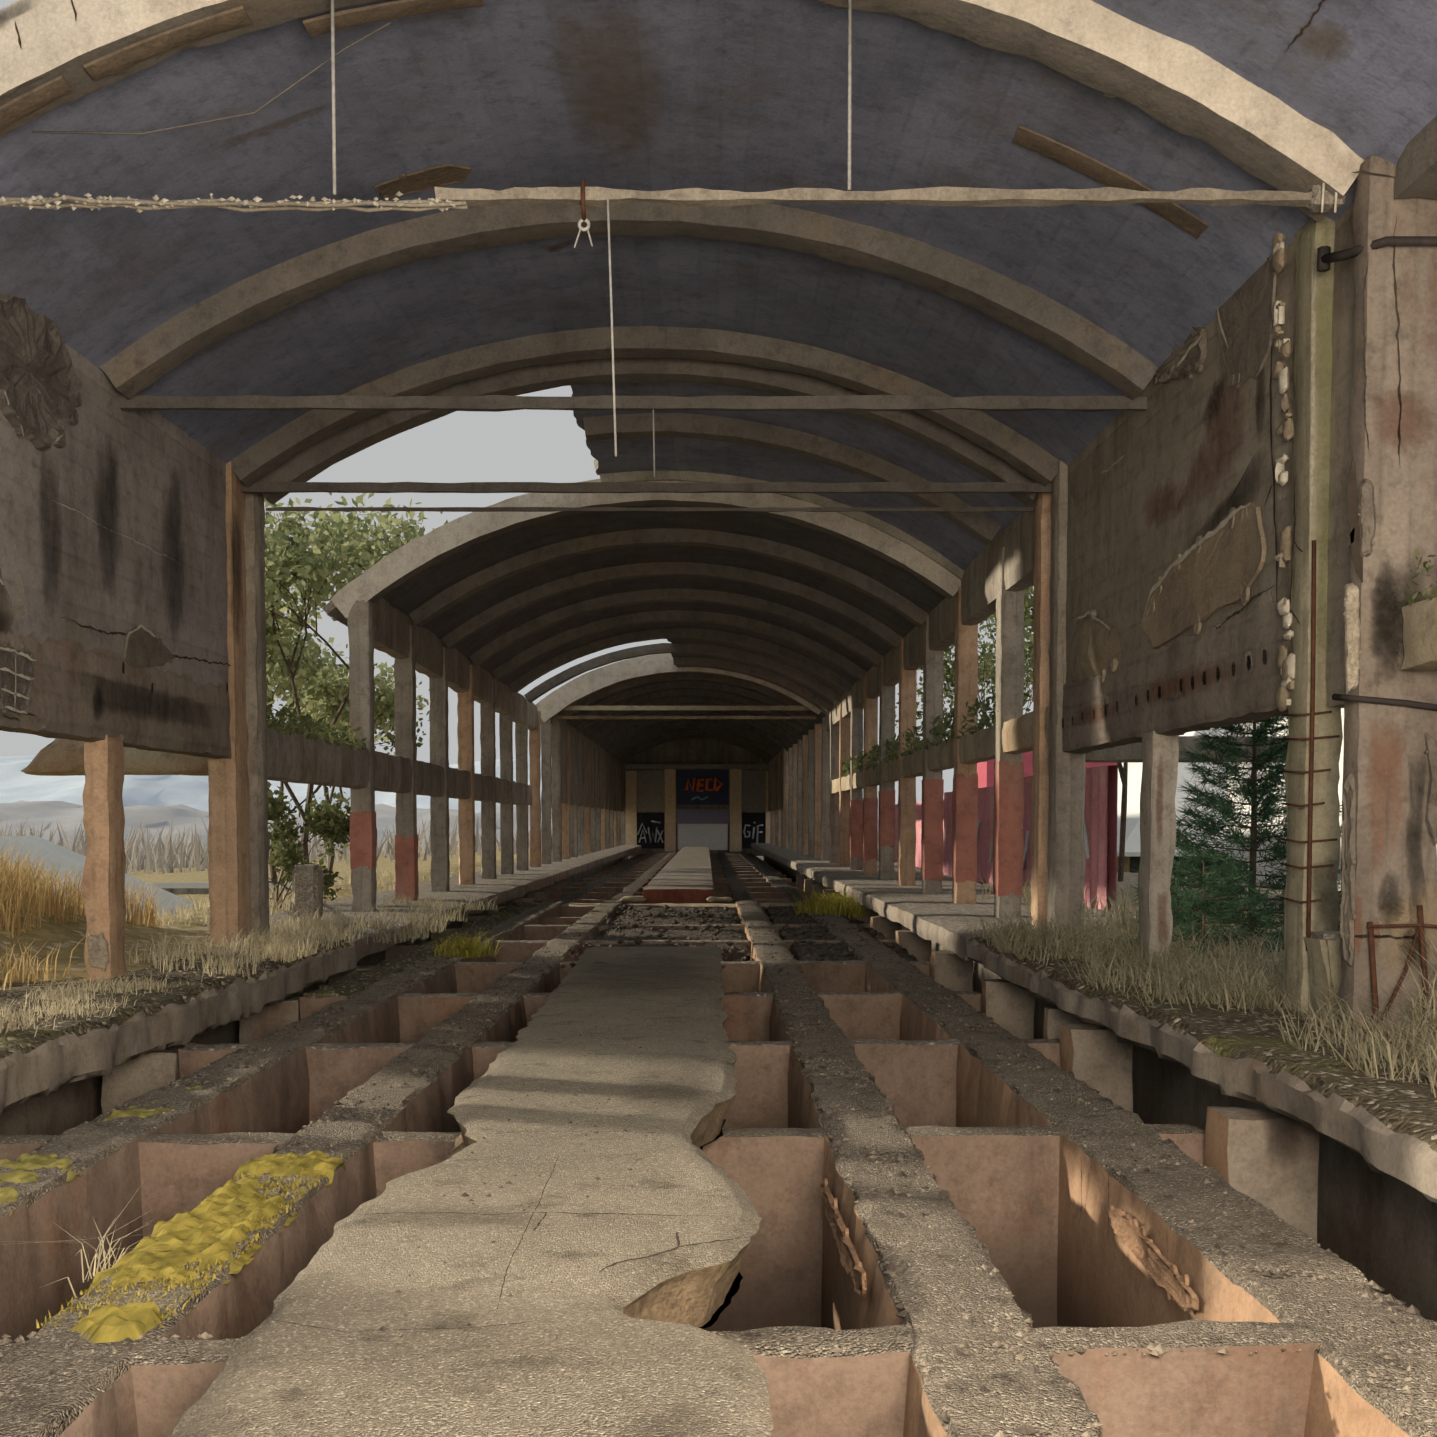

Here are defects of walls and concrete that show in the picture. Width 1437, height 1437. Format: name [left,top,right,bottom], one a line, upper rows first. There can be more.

crack [0,22,50,99]
crack [1284,0,1326,53]
water stain [1377,588,1420,654]
crack [270,1158,738,1332]